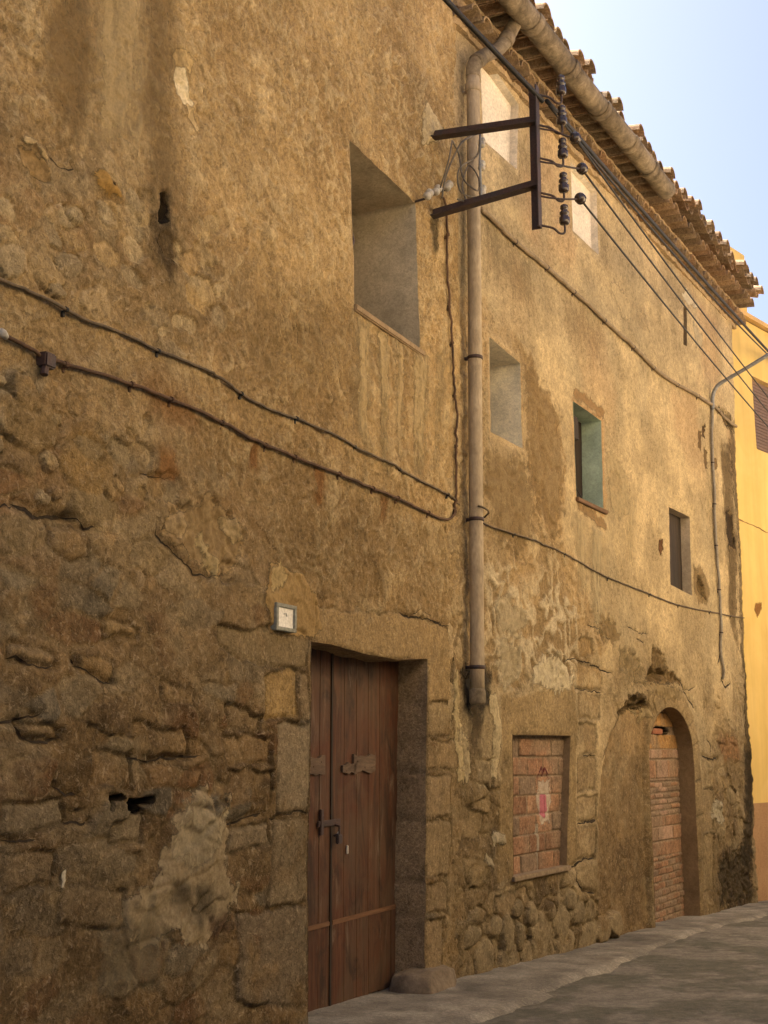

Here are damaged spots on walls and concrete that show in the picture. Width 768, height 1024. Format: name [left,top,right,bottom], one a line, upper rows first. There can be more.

flaking render [172,48,200,132]
spalling [155,192,175,274]
crack [0,503,95,531]
spalling [693,566,710,604]
crack [564,658,611,693]
spalling [597,610,681,757]
damp [718,750,754,908]
flaking render [98,784,240,995]